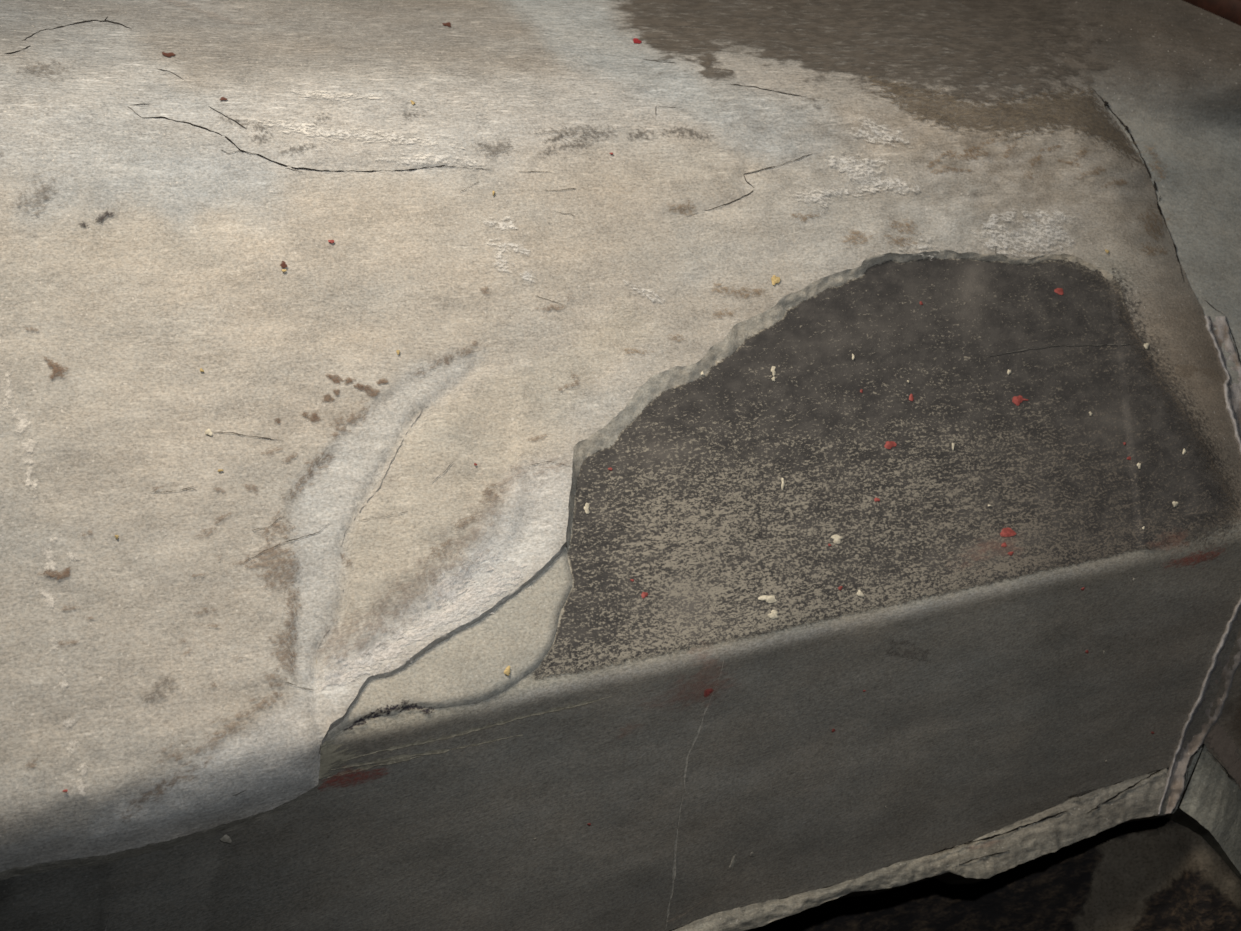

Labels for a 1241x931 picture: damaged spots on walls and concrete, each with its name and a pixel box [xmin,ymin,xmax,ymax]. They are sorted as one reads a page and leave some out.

crack [129,103,576,215]
crack [692,153,815,215]
efflorescence [789,156,920,207]
water stain [619,0,1143,167]
crack [1094,90,1241,363]
spalling [312,250,1241,789]
spalling [673,768,1173,931]